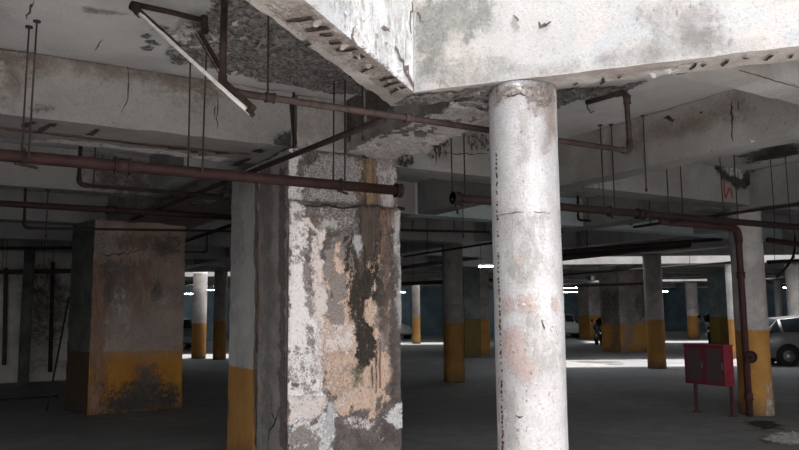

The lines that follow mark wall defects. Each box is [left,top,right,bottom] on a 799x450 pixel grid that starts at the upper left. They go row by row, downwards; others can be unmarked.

crack [121,66,129,113]
water stain [300,203,390,379]
spalling [140,0,705,450]
crack [434,145,545,450]
crack [730,98,740,141]
water stain [725,143,799,180]